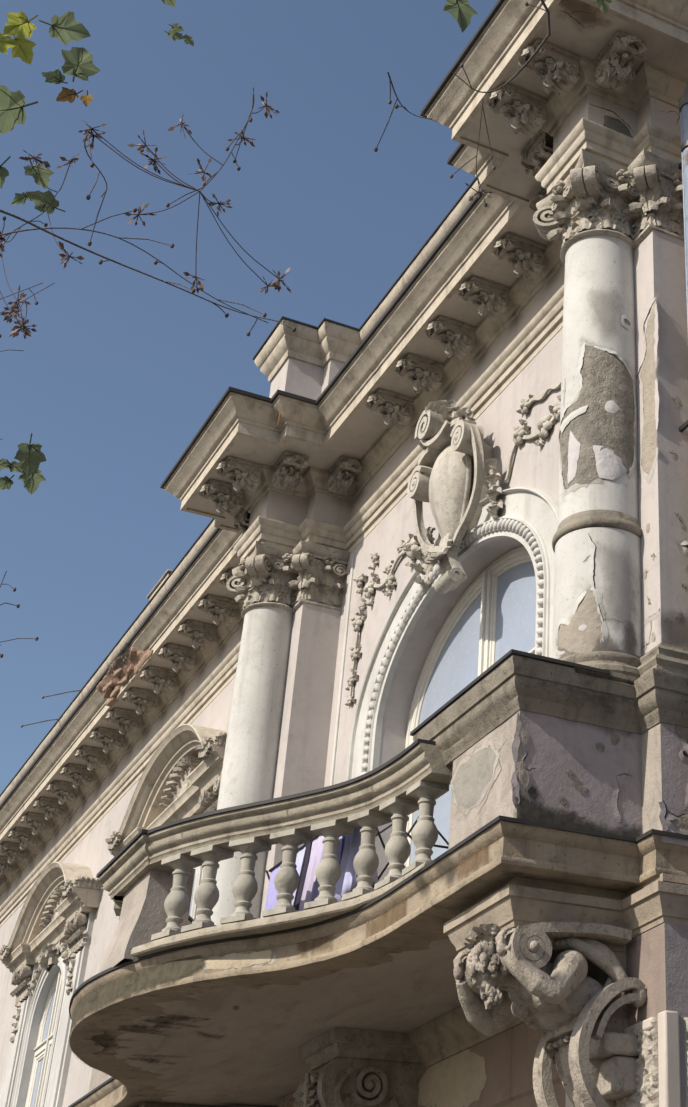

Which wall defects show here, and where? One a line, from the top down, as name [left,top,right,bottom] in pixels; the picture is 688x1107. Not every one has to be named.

peeling [559,298,678,495]
peeling [556,585,609,658]
damp [514,787,641,838]